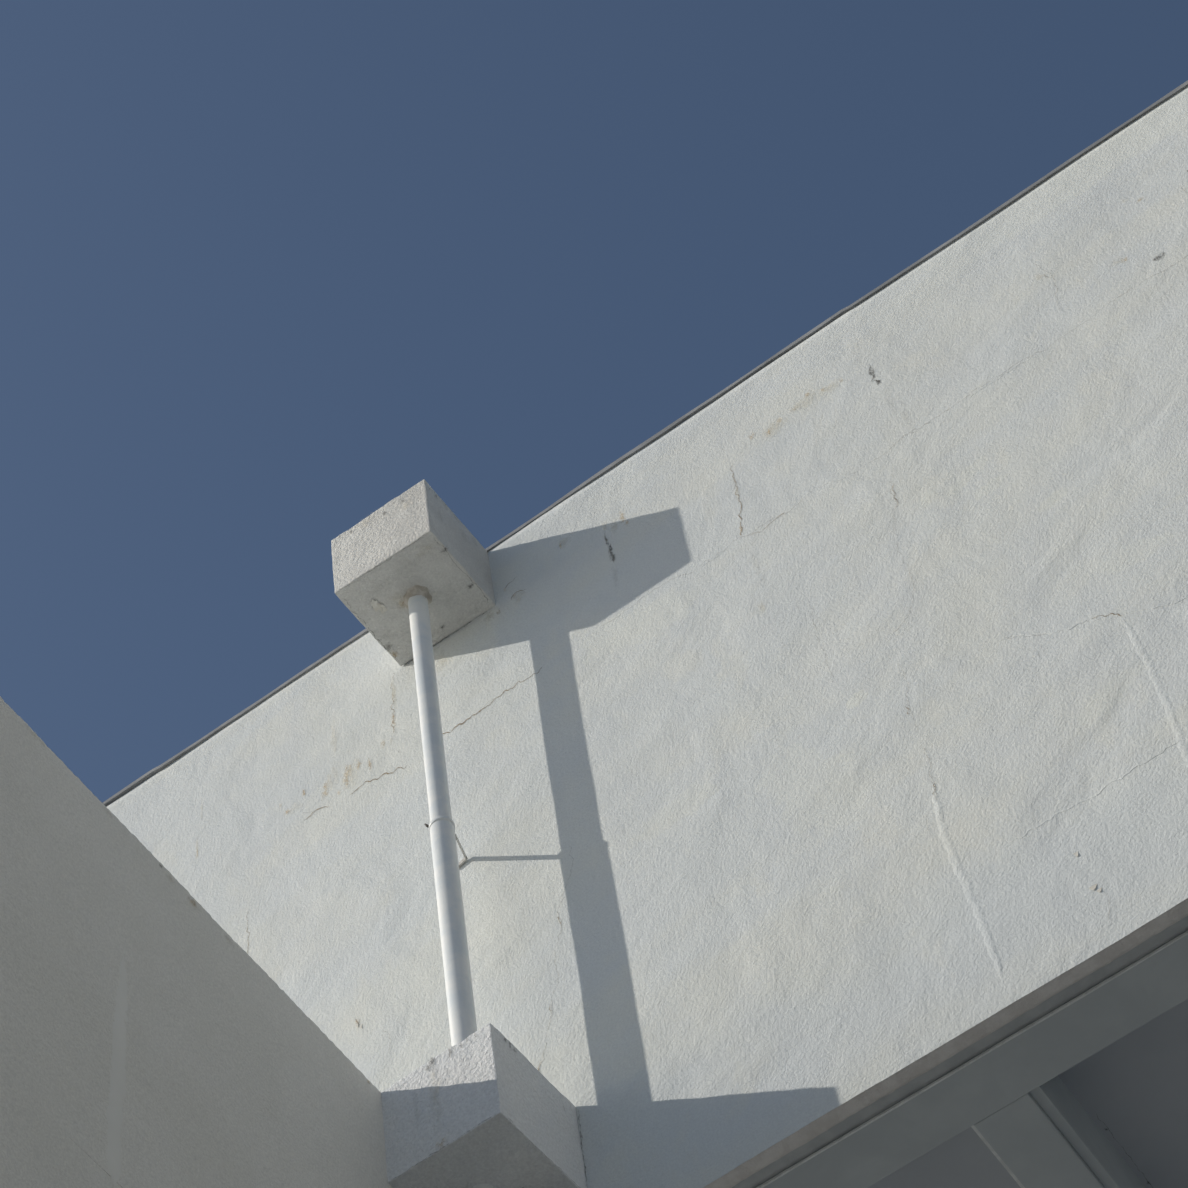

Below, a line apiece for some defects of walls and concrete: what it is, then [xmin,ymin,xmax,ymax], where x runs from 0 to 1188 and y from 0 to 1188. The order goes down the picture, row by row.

crack [443,673,535,734]